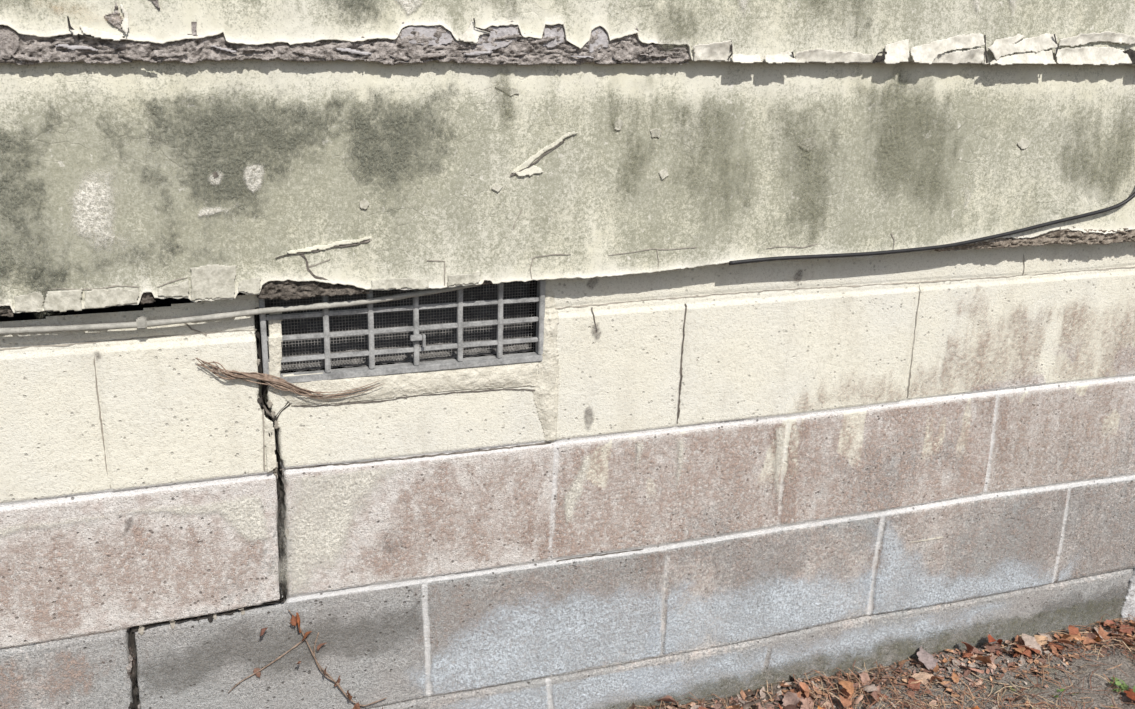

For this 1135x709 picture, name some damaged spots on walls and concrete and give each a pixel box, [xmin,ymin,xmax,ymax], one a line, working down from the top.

spalling [0,0,1135,66]
water stain [0,113,67,314]
peeling [0,264,429,317]
water stain [146,91,332,216]
water stain [334,87,454,188]
peeling [447,271,492,287]
peeling [491,131,578,192]
water stain [870,72,957,202]
spalling [935,226,1135,252]
crack [0,315,551,709]
water stain [142,305,1135,709]
water stain [0,521,263,635]